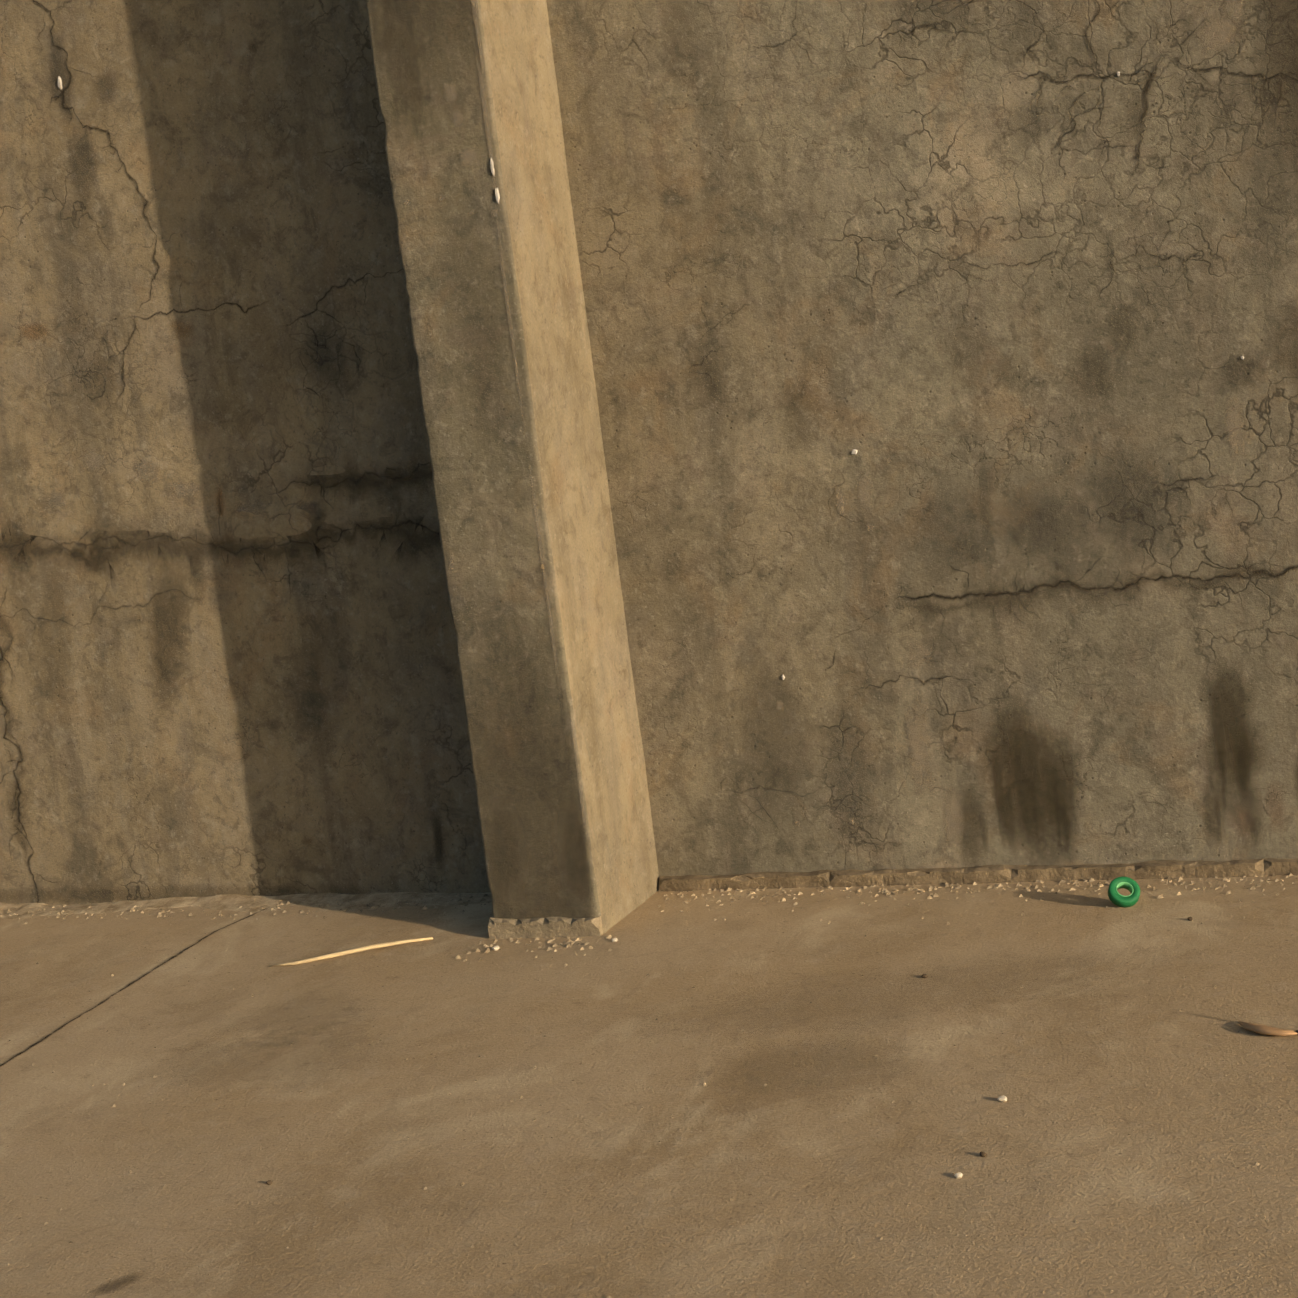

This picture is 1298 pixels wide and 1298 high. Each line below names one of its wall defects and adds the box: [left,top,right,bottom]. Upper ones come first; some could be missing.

crack [33,0,258,391]
crack [965,252,1053,284]
crack [1101,219,1192,291]
crack [0,468,436,571]
crack [908,566,1298,616]
water stain [1214,682,1254,779]
crack [0,699,51,895]
water stain [994,731,1067,837]